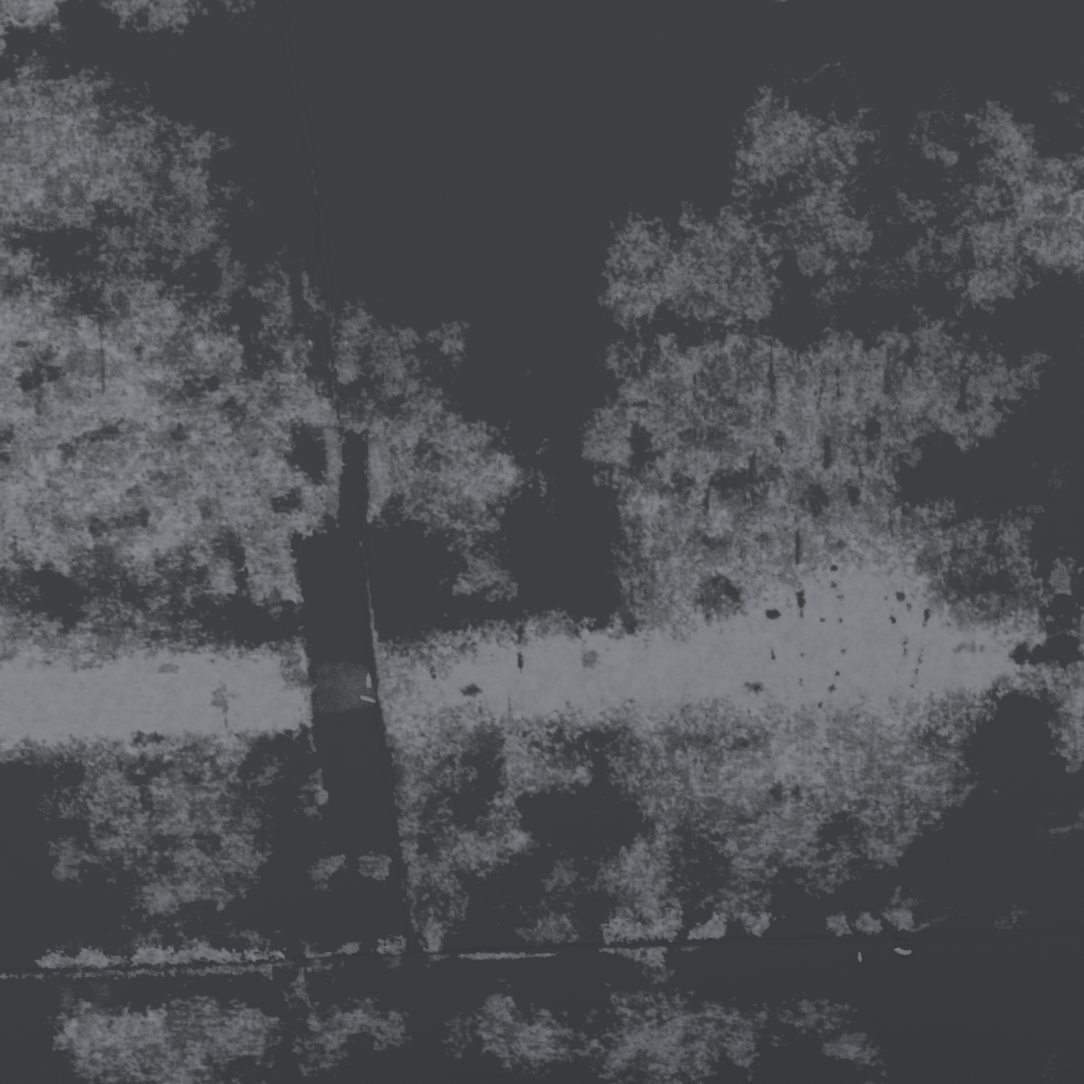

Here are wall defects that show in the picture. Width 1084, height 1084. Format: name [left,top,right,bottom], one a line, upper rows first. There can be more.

leakage [0,0,1084,669]
crack [0,366,1084,1022]
leakage [0,688,1084,1084]